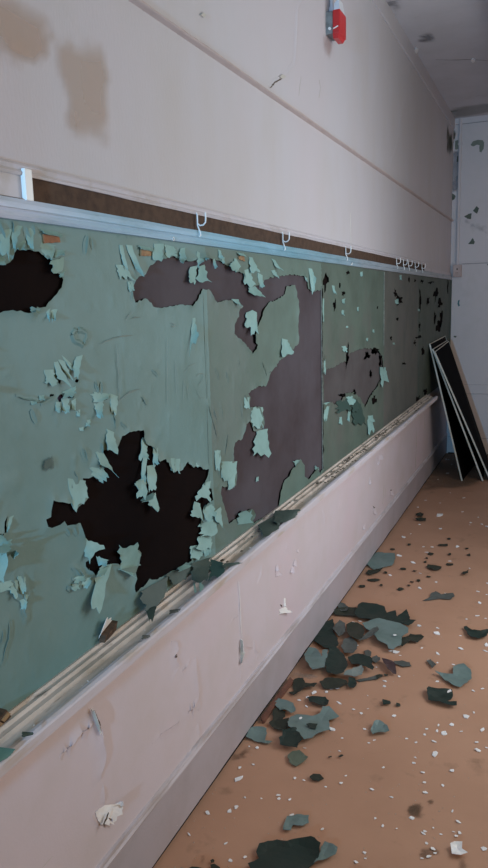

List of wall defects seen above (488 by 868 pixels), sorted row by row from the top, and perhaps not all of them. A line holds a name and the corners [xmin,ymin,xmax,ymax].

peeling [0,225,65,322]
peeling [399,275,448,332]
peeling [31,355,118,431]
peeling [46,244,389,637]
peeling [0,516,28,610]